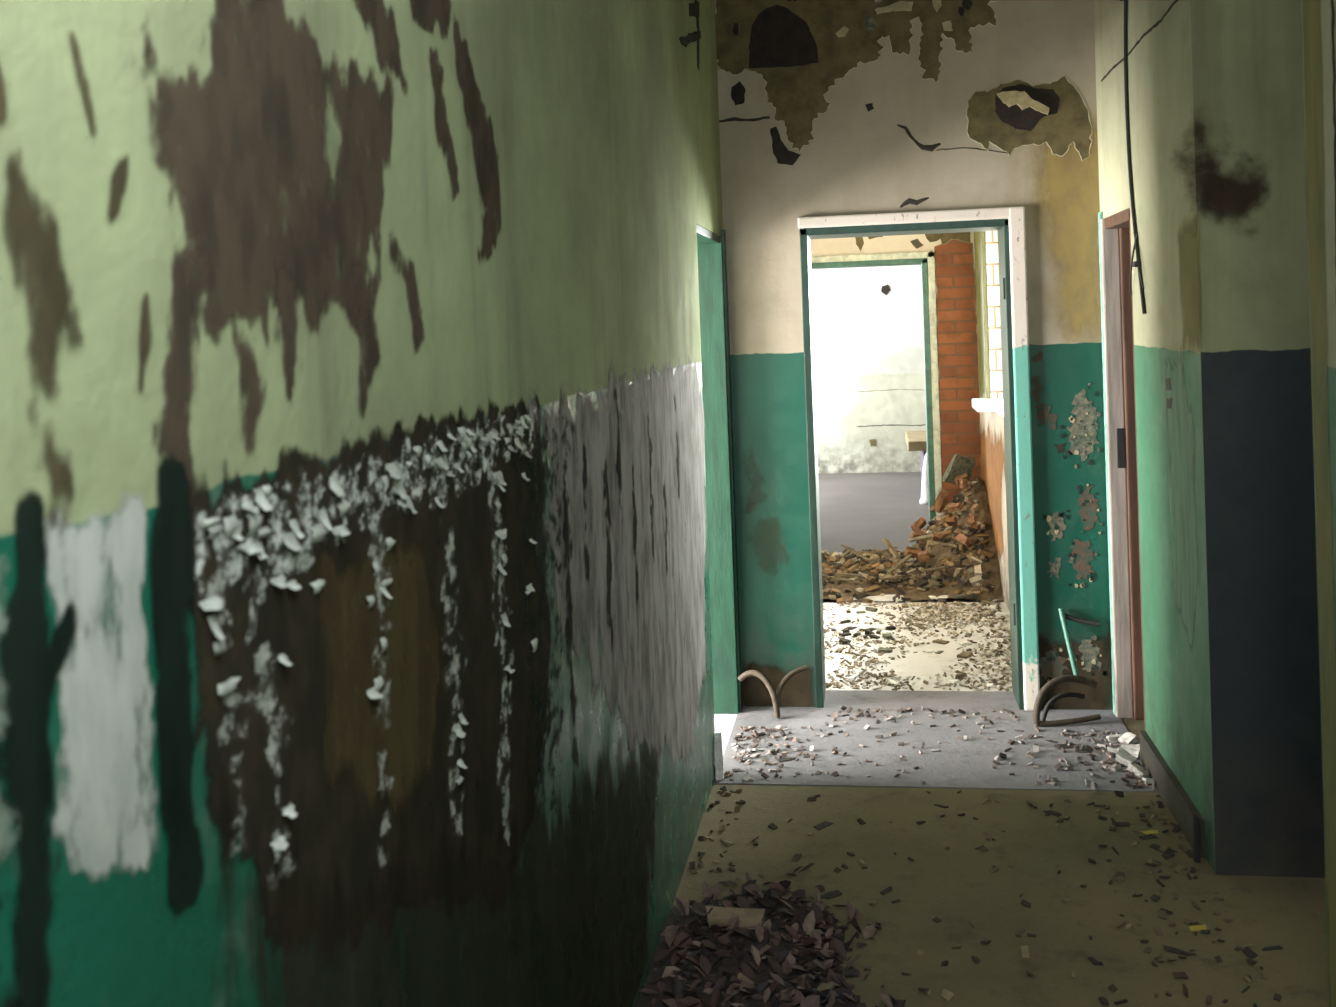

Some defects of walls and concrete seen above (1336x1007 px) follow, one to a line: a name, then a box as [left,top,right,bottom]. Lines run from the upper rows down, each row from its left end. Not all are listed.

water stain [70,32,96,134]
water stain [108,156,129,221]
water stain [410,0,501,260]
peeling [679,0,998,165]
flaking render [966,75,1093,161]
water stain [5,153,83,396]
water stain [139,293,152,392]
water stain [144,0,424,913]
peeling [1030,351,1104,468]
peeling [1043,484,1102,588]
peeling [188,360,706,1007]
peeling [1039,636,1106,682]